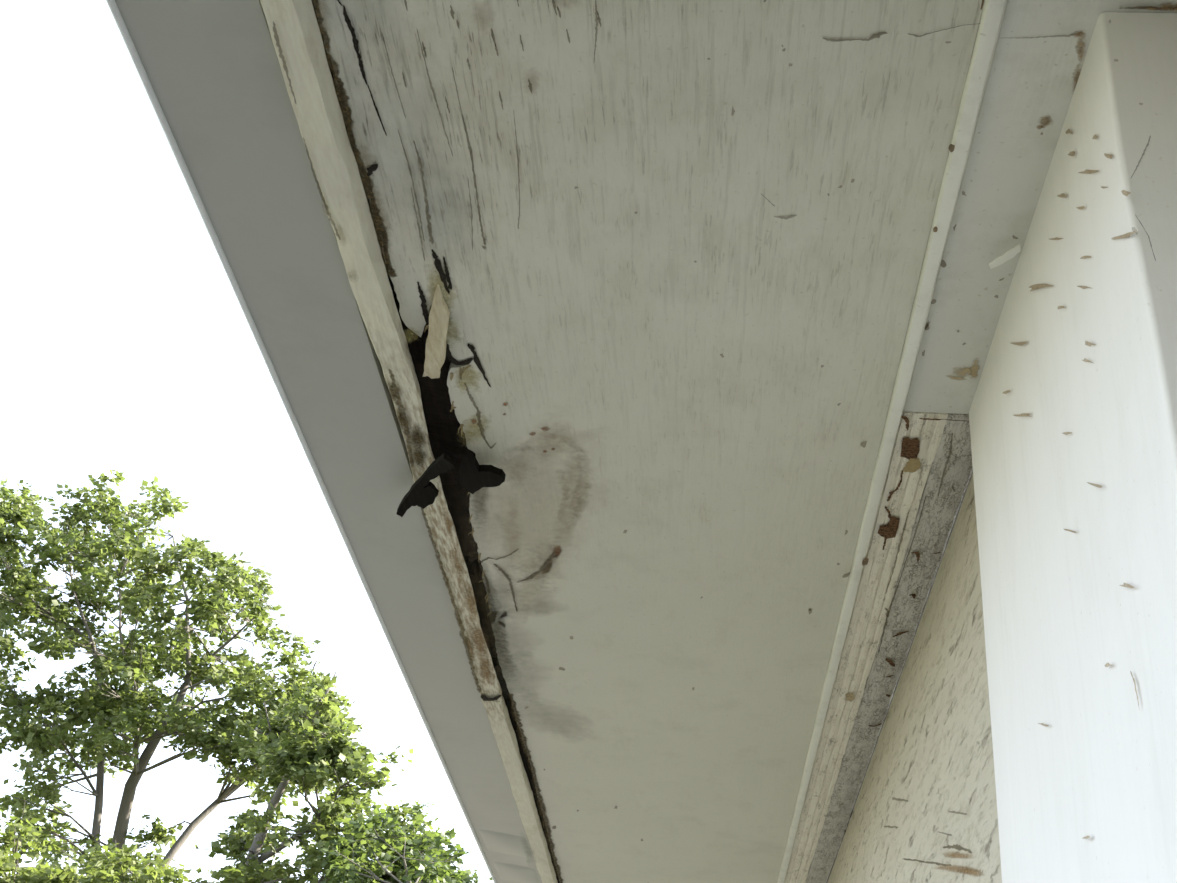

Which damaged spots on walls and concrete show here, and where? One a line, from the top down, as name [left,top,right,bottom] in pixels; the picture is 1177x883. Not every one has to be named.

crack [479,549,559,611]
crack [508,694,563,883]